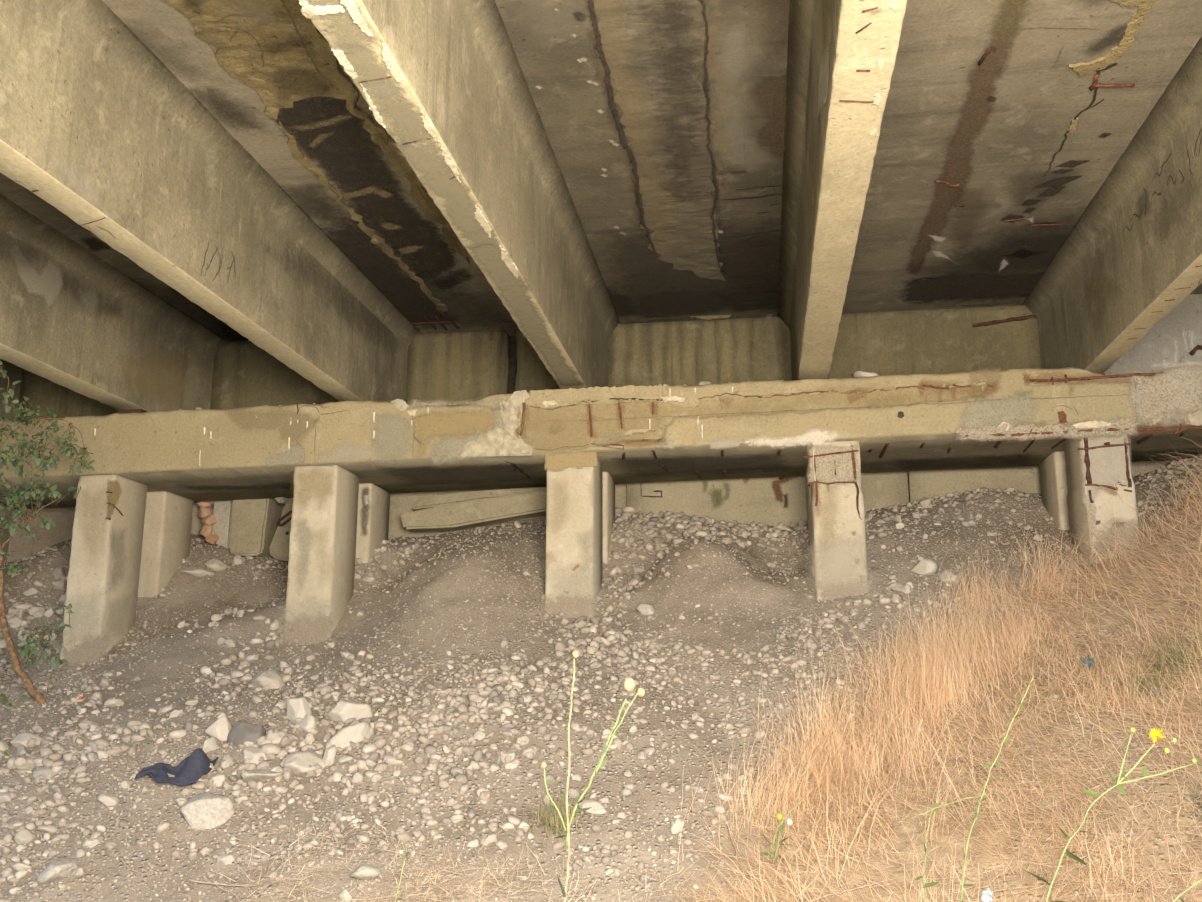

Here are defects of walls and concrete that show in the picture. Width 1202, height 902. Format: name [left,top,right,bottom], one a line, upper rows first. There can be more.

crack [575,0,656,253]
crack [688,0,783,321]
crack [1018,27,1089,68]
crack [1043,63,1118,177]
spalling [1089,73,1135,90]
peeling [301,0,701,472]
damp [613,226,780,309]
damp [142,287,238,338]
spalling [1024,372,1177,391]